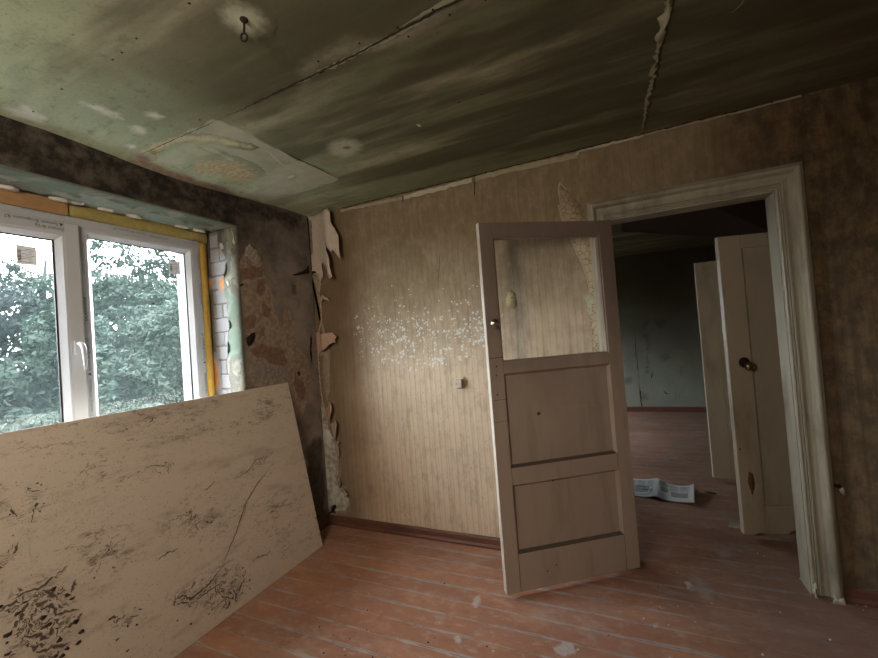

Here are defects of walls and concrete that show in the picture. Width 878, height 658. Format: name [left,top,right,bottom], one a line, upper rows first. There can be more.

crack [138,0,540,178]
crack [343,0,773,208]
peeling [0,184,330,422]
damp [354,289,485,372]